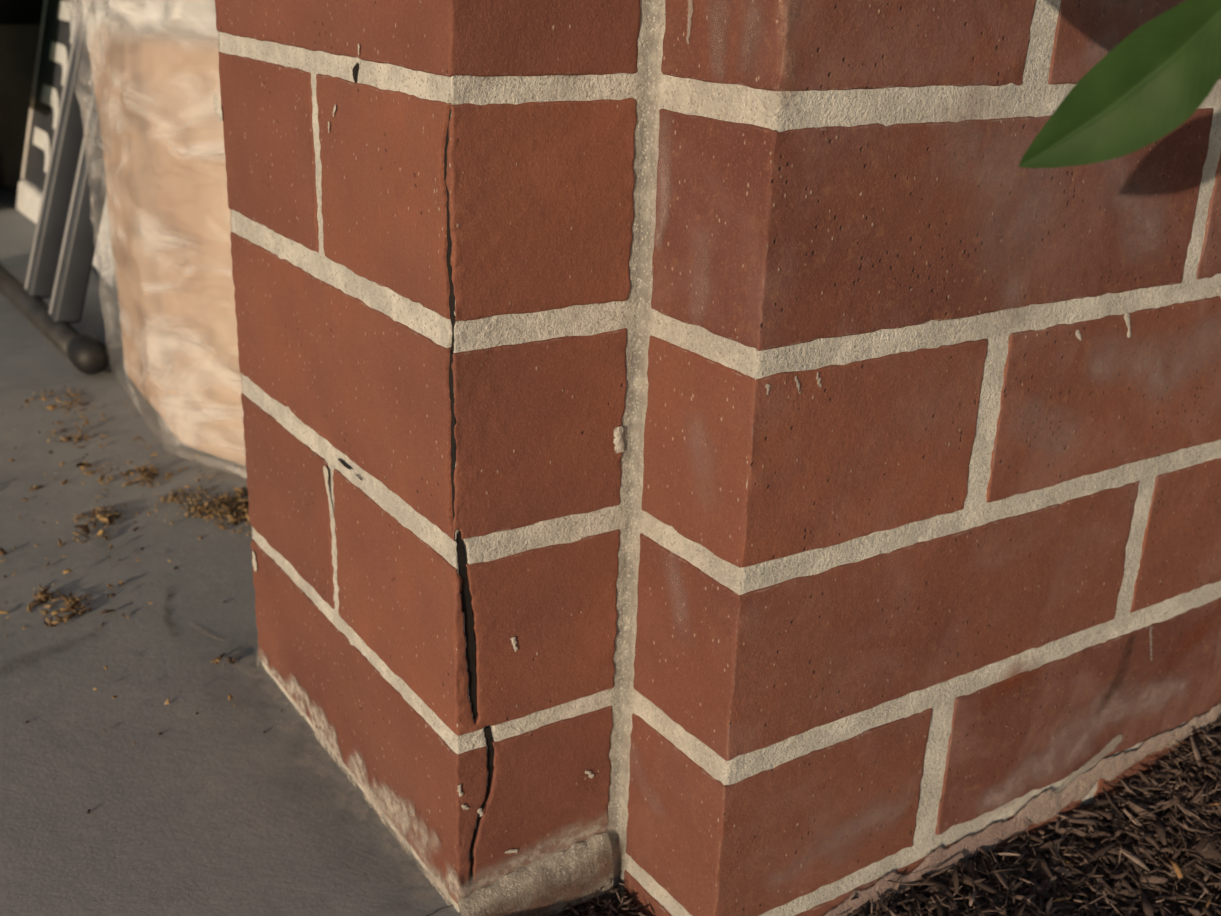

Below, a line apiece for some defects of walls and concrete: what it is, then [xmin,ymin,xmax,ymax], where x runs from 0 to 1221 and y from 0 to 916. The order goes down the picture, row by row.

damp [257,655,428,853]
crack [426,109,494,916]